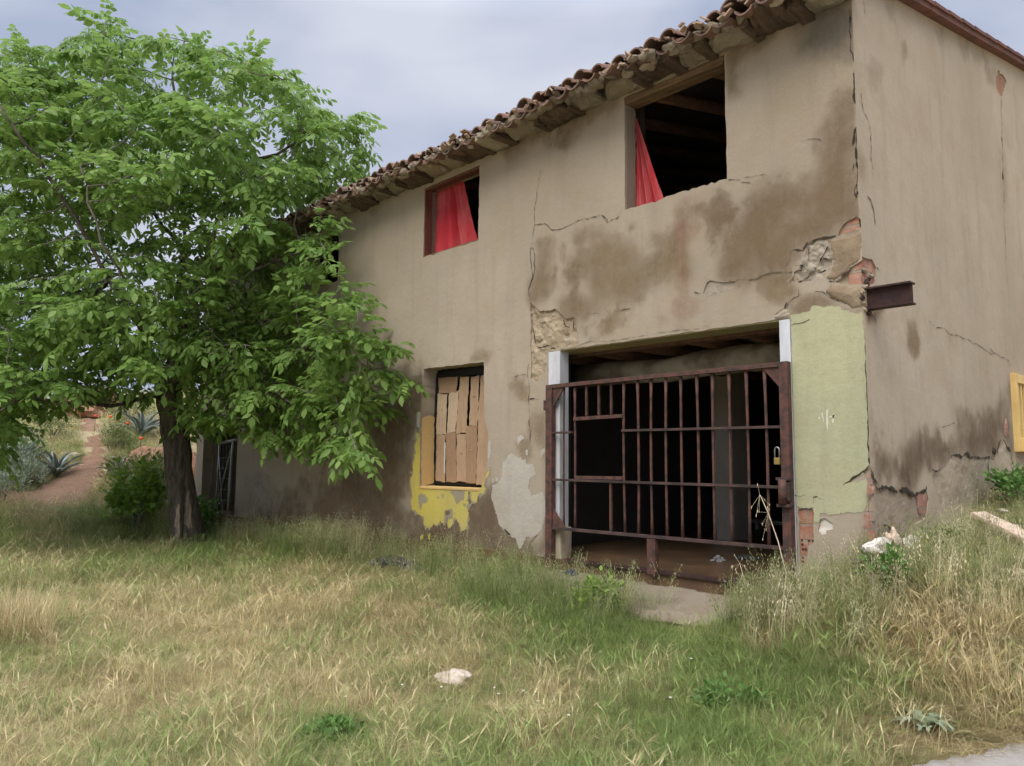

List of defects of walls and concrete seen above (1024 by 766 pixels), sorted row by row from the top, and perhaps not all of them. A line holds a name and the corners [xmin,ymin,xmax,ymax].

crack [849,6,876,225]
spalling [996,71,1006,96]
crack [528,170,622,298]
damp [726,116,857,296]
crack [738,235,851,326]
spalling [792,217,860,282]
spalling [837,258,875,316]
spalling [531,303,578,382]
crack [843,328,1011,497]
peeling [410,411,545,549]
damp [879,434,946,485]
spalling [799,508,833,573]